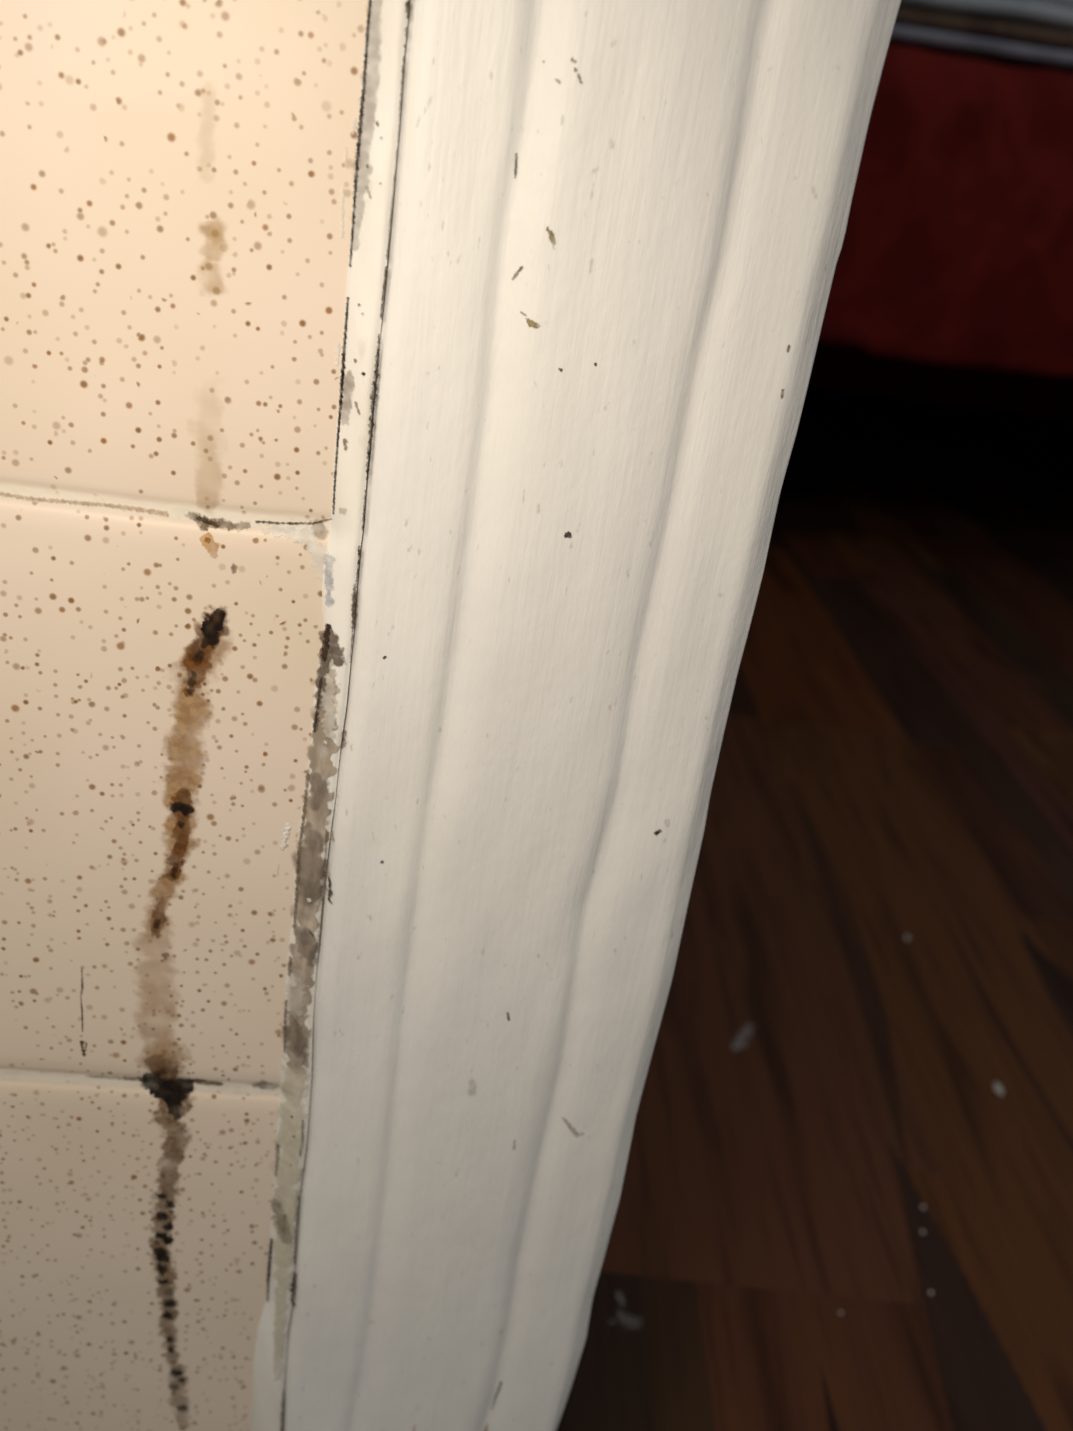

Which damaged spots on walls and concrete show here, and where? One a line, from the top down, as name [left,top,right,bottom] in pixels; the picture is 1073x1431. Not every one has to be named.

rust [147,608,228,938]